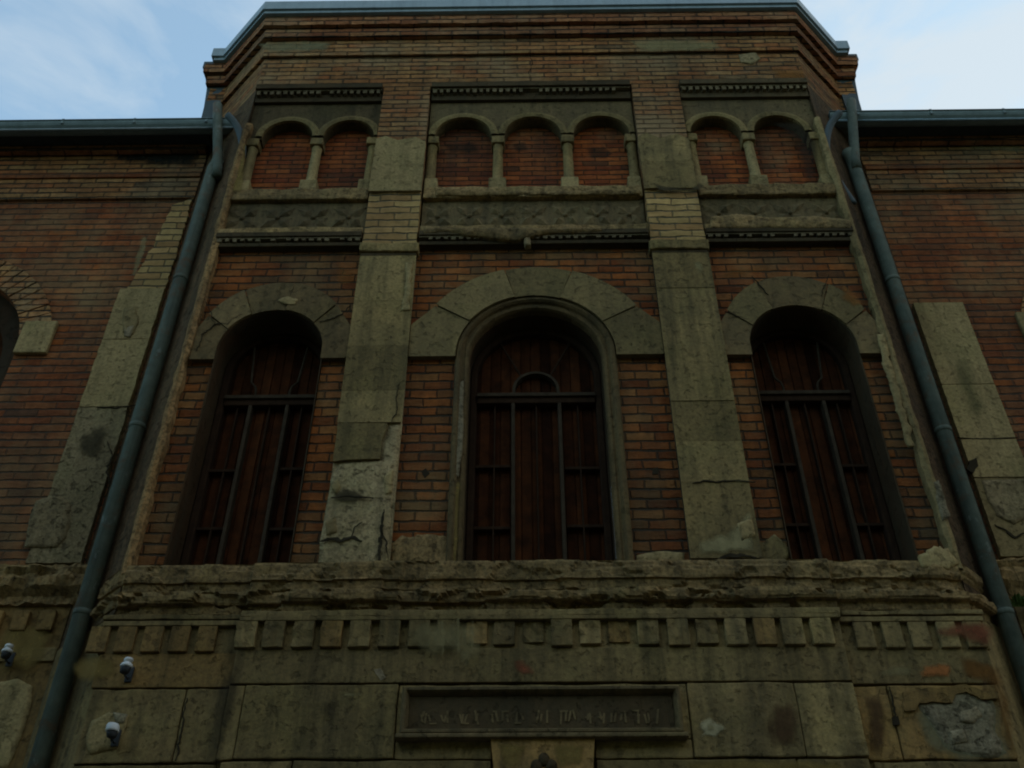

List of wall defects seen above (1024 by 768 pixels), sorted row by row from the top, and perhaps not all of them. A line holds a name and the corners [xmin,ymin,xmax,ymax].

crack [320,509,388,561]
flaking render [701,516,790,559]
flaking render [902,664,1007,759]